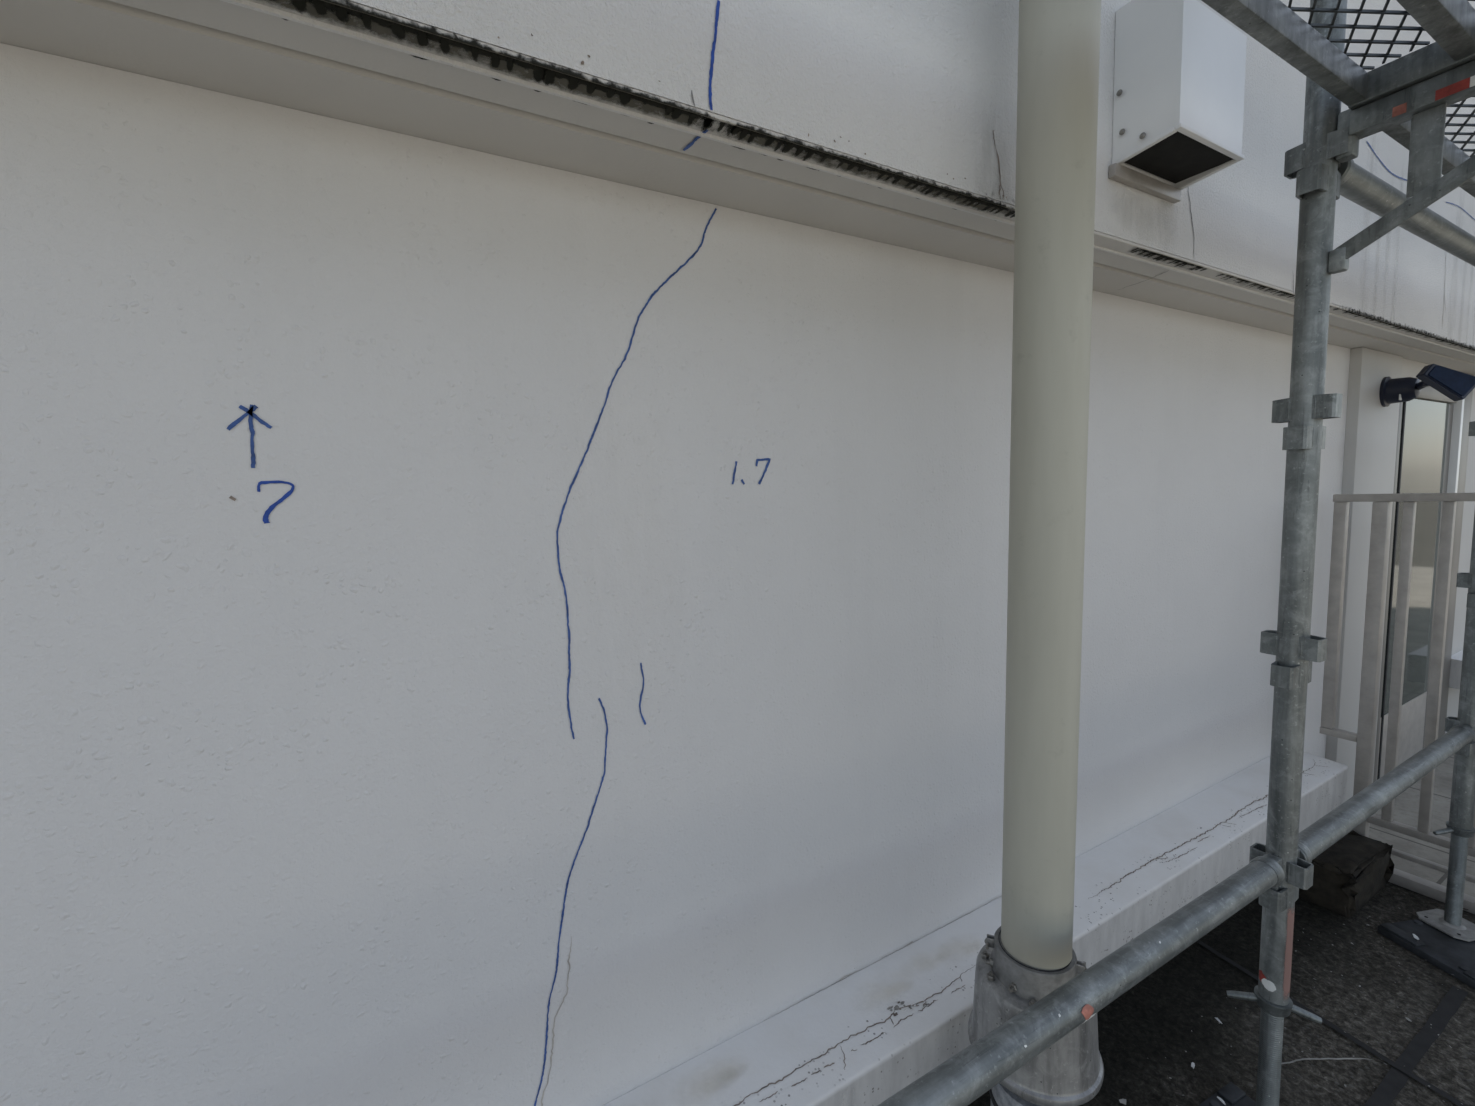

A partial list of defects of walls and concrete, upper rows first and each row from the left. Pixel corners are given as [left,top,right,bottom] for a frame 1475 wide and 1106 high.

crack [1088,795,1267,899]
crack [541,938,572,1106]
crack [734,965,975,1106]
crack [767,896,1001,1019]